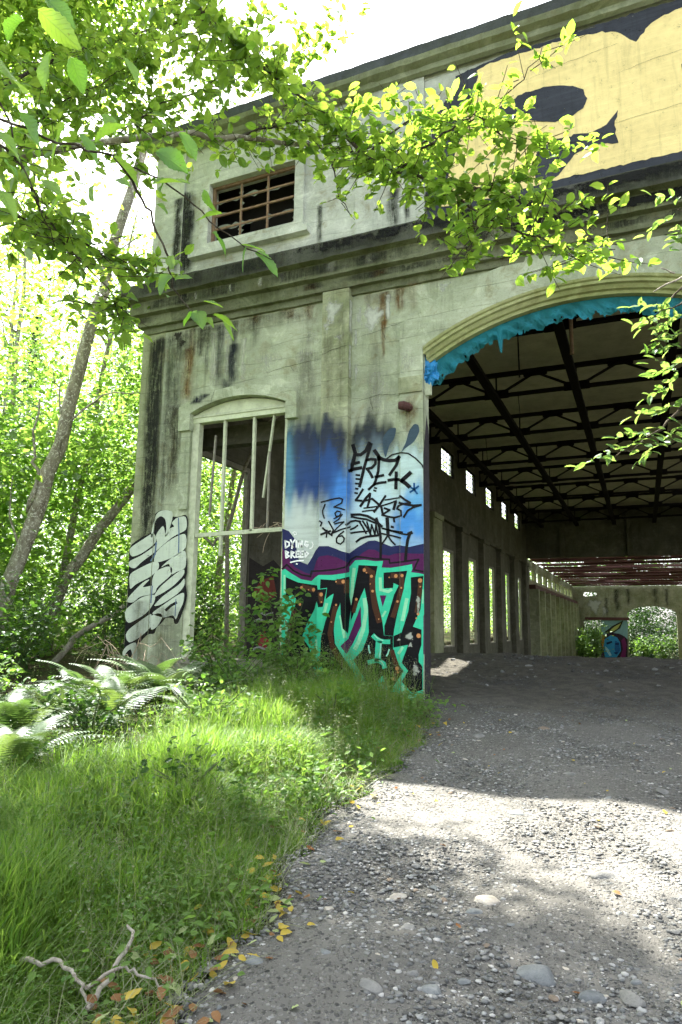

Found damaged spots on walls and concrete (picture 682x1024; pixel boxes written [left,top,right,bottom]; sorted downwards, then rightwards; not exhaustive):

water stain [145,192,214,308]
water stain [225,255,275,289]
water stain [280,206,384,289]
corrosion [379,288,404,332]
water stain [526,184,615,229]
water stain [142,321,246,536]